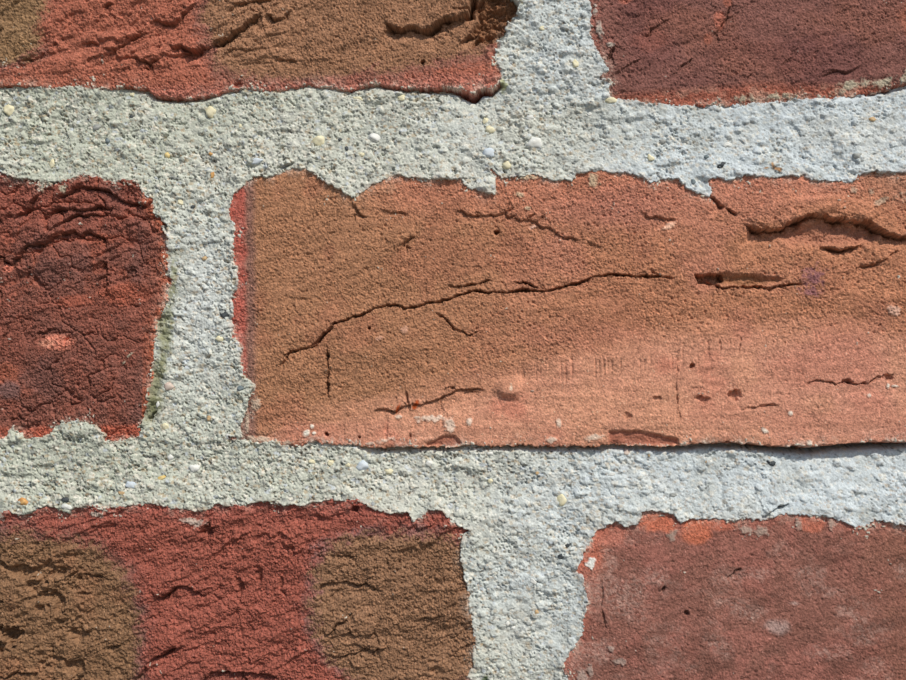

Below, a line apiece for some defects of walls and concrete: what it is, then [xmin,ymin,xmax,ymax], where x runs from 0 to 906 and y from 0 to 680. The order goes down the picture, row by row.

crack [382,0,478,45]
crack [707,195,906,271]
crack [702,276,801,292]
crack [278,269,675,400]
crack [719,336,742,356]
crack [372,383,488,443]